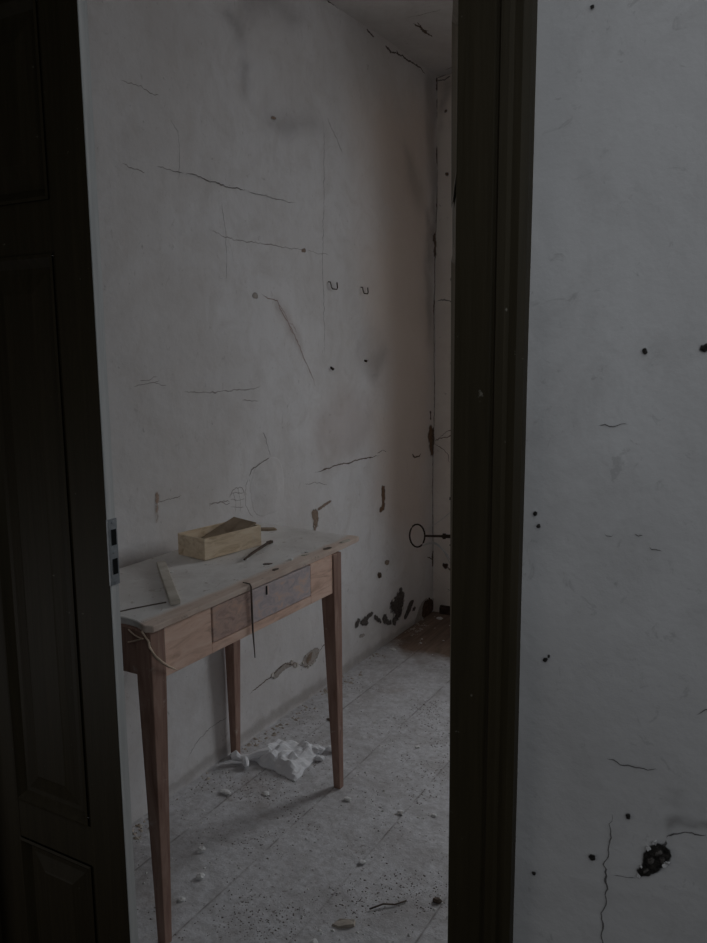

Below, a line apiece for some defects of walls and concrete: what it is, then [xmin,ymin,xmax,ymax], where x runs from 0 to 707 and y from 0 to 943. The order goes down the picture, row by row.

crack [367,29,450,90]
crack [125,121,295,203]
crack [433,204,451,328]
crack [308,450,386,485]
crack [412,375,451,573]
crack [601,816,633,943]
flaking render [637,840,671,878]